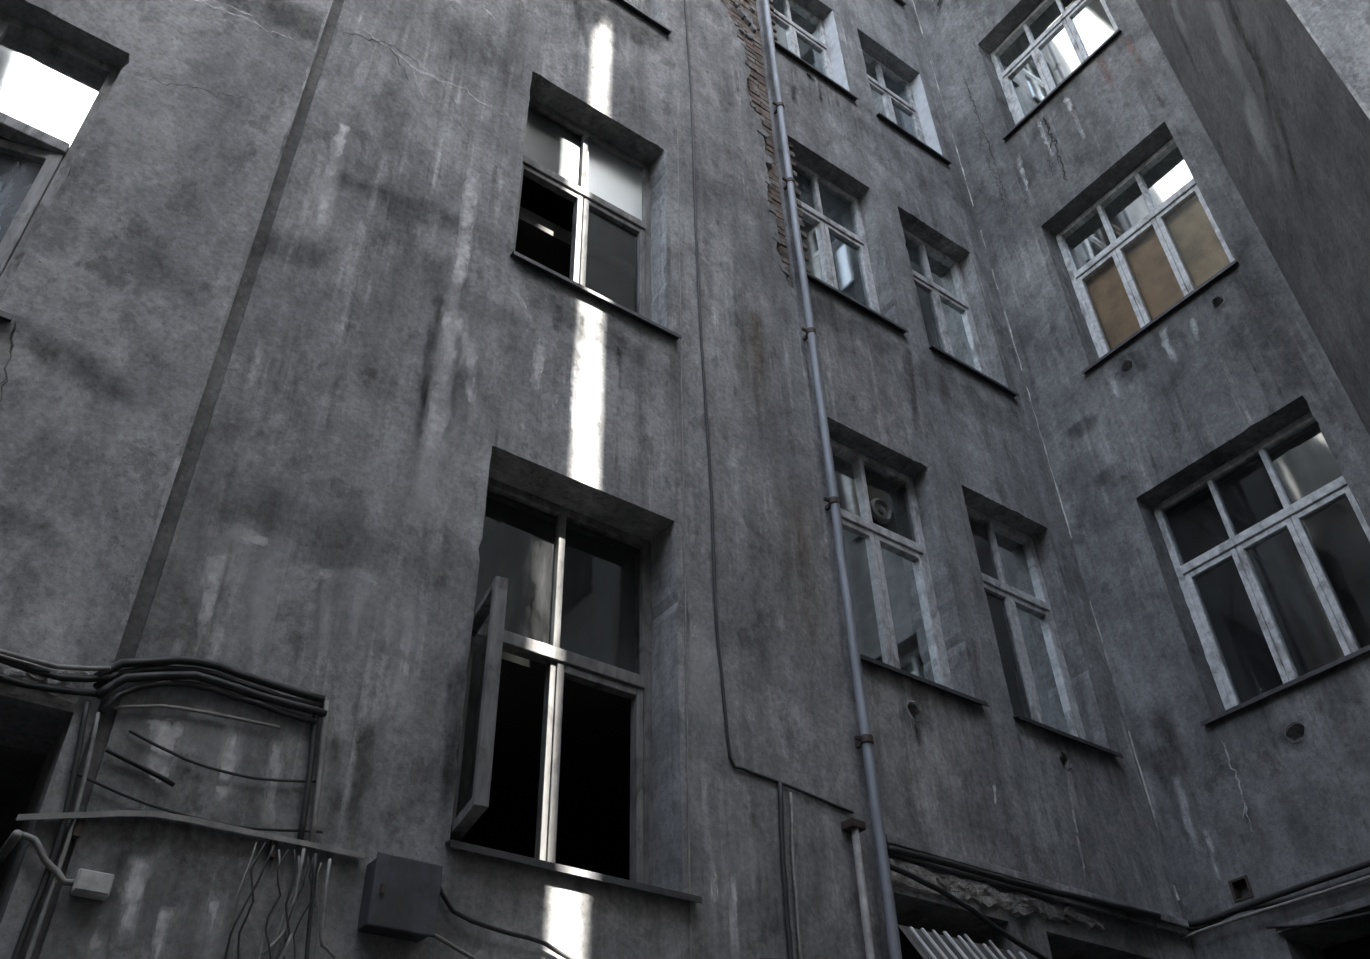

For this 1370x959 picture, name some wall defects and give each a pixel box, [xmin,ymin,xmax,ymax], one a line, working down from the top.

damp [316,124,349,226]
flaking render [721,0,811,288]
damp [451,176,478,284]
crack [912,0,1072,539]
crack [0,324,16,401]
damp [420,298,477,472]
crack [1089,601,1110,669]
crack [1128,731,1153,812]